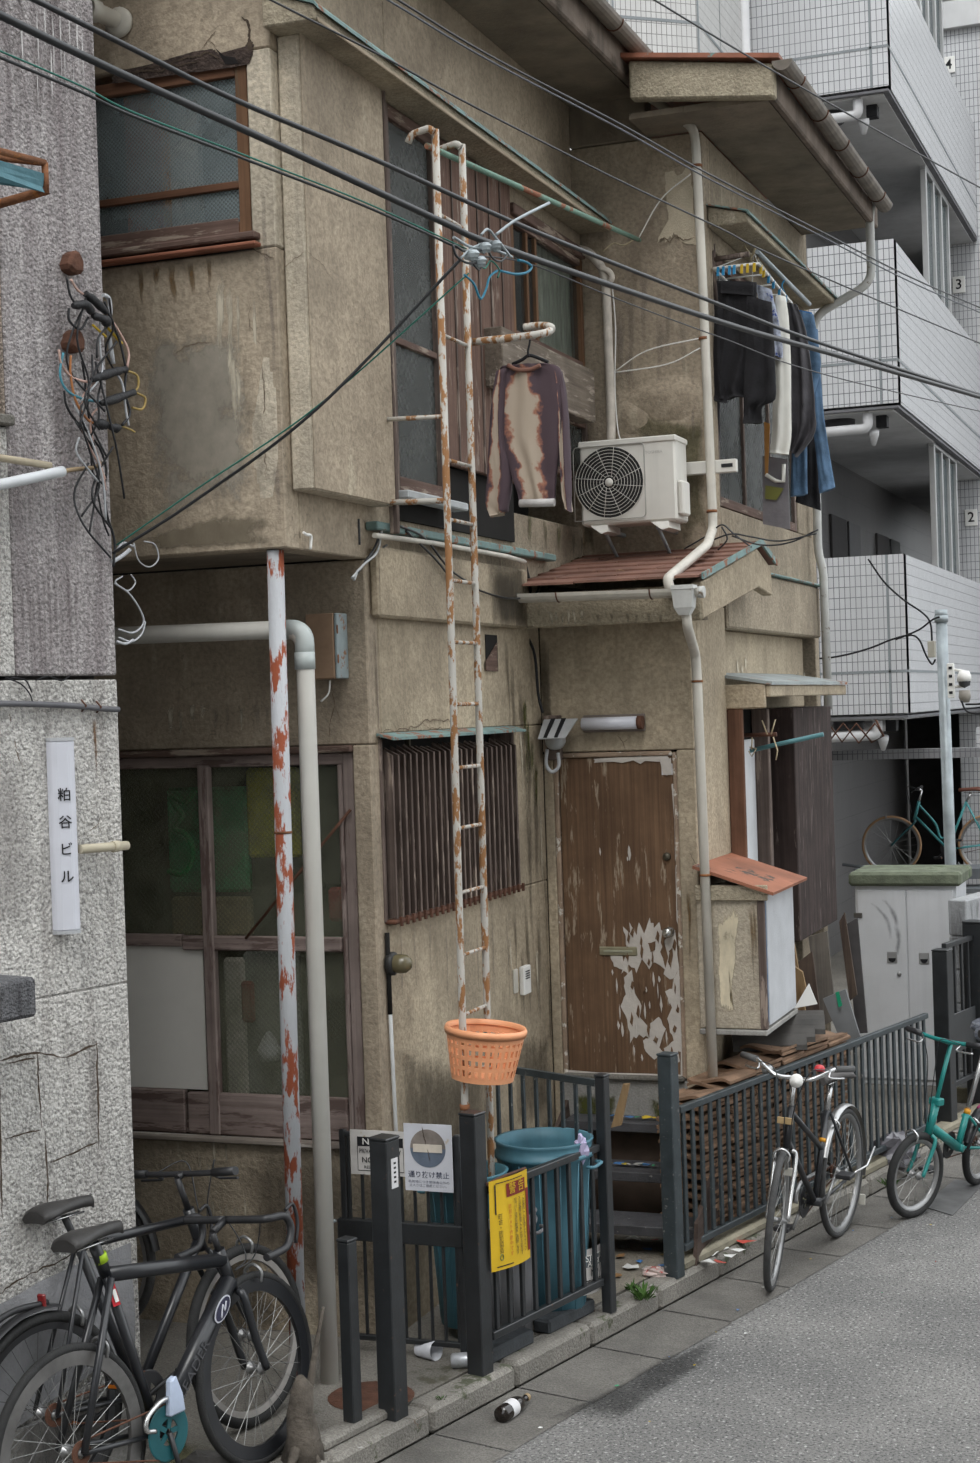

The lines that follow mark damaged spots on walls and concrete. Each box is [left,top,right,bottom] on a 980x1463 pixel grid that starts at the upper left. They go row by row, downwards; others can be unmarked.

damp [21,12,83,92]
peeling [568,856,683,1076]